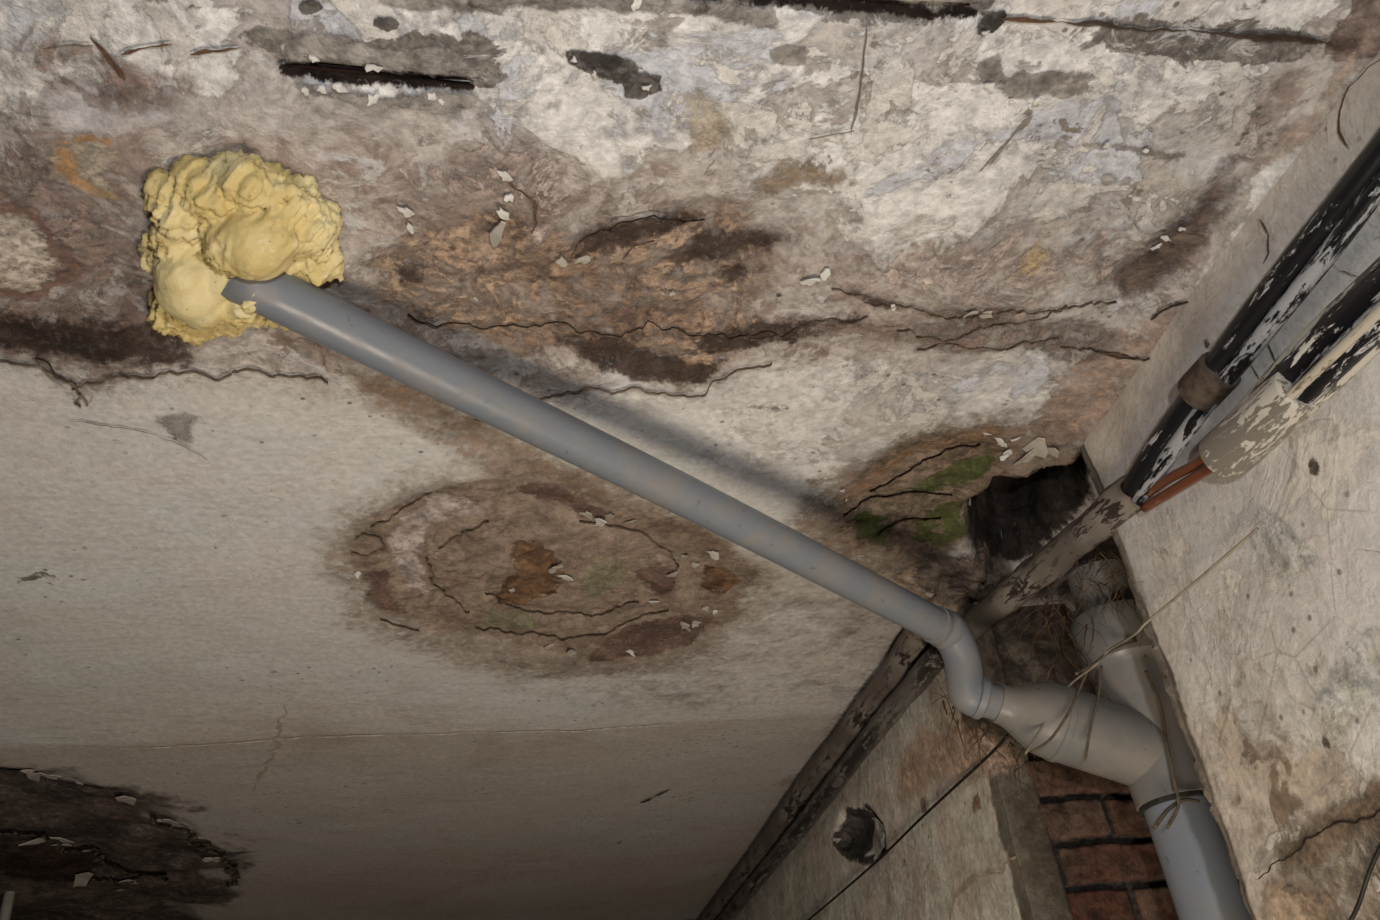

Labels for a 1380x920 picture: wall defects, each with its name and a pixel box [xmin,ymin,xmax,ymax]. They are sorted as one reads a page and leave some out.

crack [0,356,328,408]
crack [539,268,1142,400]
spalling [327,467,764,678]
spalling [795,415,1091,617]
spalling [0,769,252,920]
damp [1260,793,1380,920]